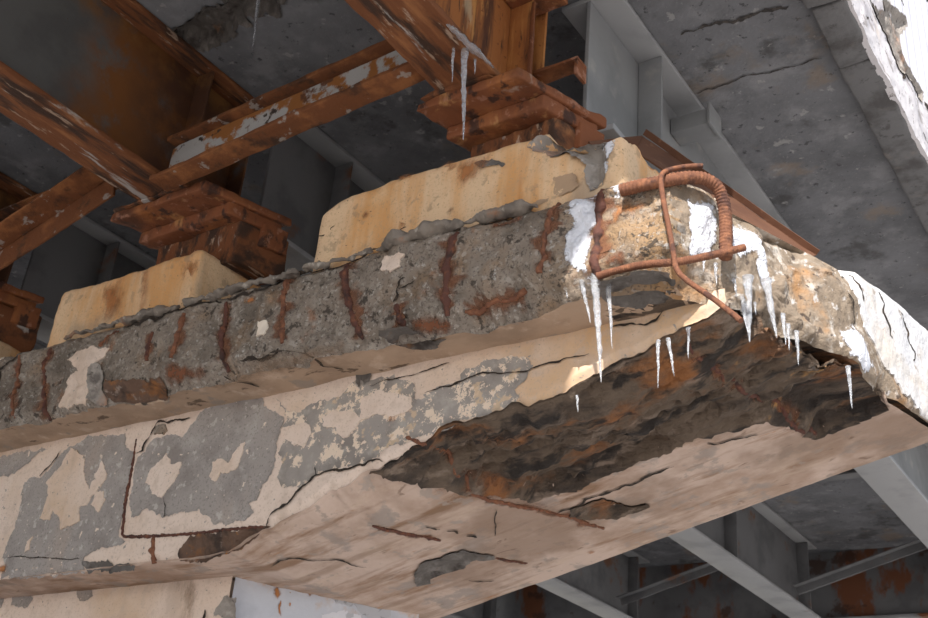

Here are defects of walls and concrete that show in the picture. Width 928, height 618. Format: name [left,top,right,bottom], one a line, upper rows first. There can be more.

spalling [172,0,286,53]
spalling [873,0,924,103]
corrosion [413,318,450,333]
crack [848,275,916,361]
corrosion [167,364,202,382]
crack [224,348,341,387]
spalling [0,135,889,579]
crack [372,354,587,392]
crack [266,458,381,526]
crack [426,511,497,538]
spalling [414,550,528,587]
peeling [0,596,33,608]